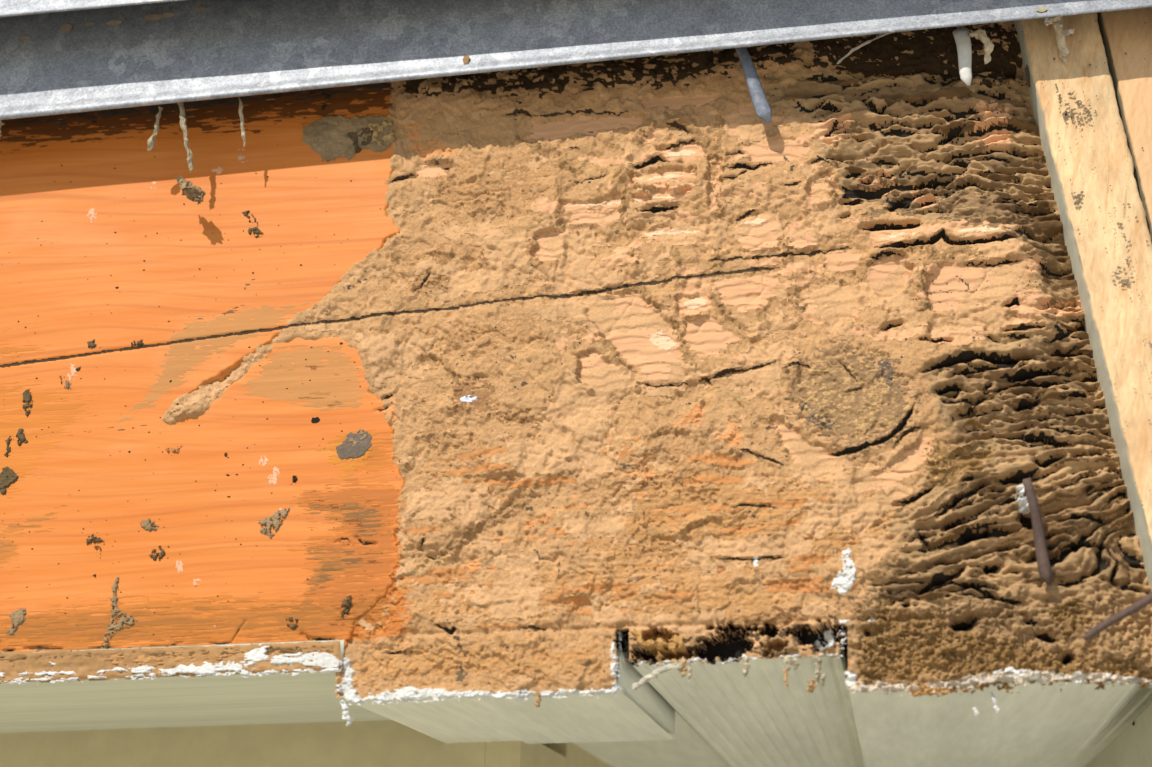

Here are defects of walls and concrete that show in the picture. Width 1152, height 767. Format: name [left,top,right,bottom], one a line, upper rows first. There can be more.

peeling [526,94,720,142]
peeling [415,163,451,181]
crack [0,69,1070,367]
peeling [533,144,723,262]
peeling [577,272,781,387]
peeling [736,72,1144,601]
crack [644,361,811,405]
crack [712,416,788,466]
crack [731,503,776,519]
crack [826,297,1148,664]
crack [708,556,785,581]
crack [435,619,491,685]